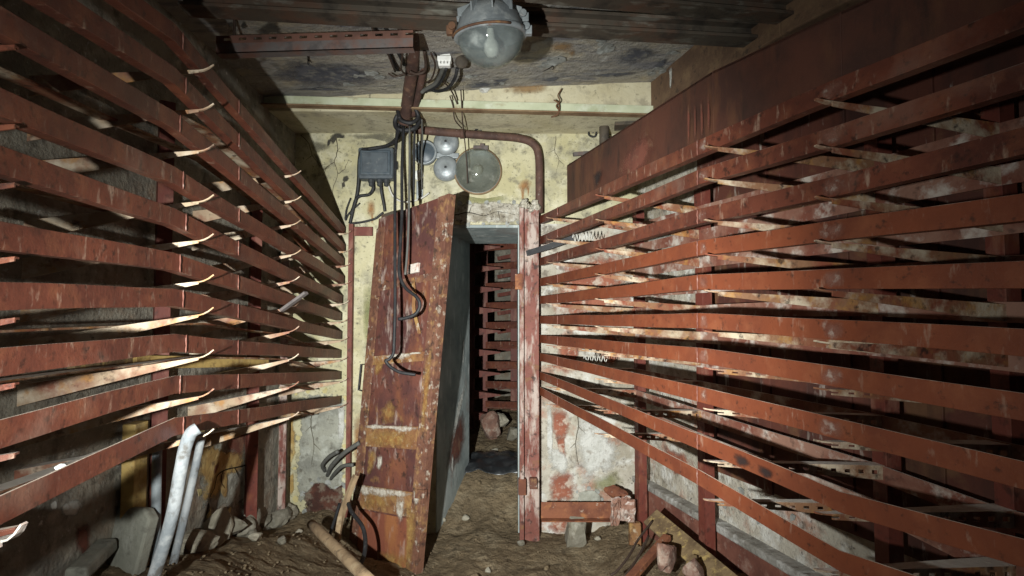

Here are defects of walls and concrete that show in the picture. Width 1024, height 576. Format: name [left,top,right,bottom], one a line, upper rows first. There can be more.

crack [301,135,348,200]
spalling [457,198,541,237]